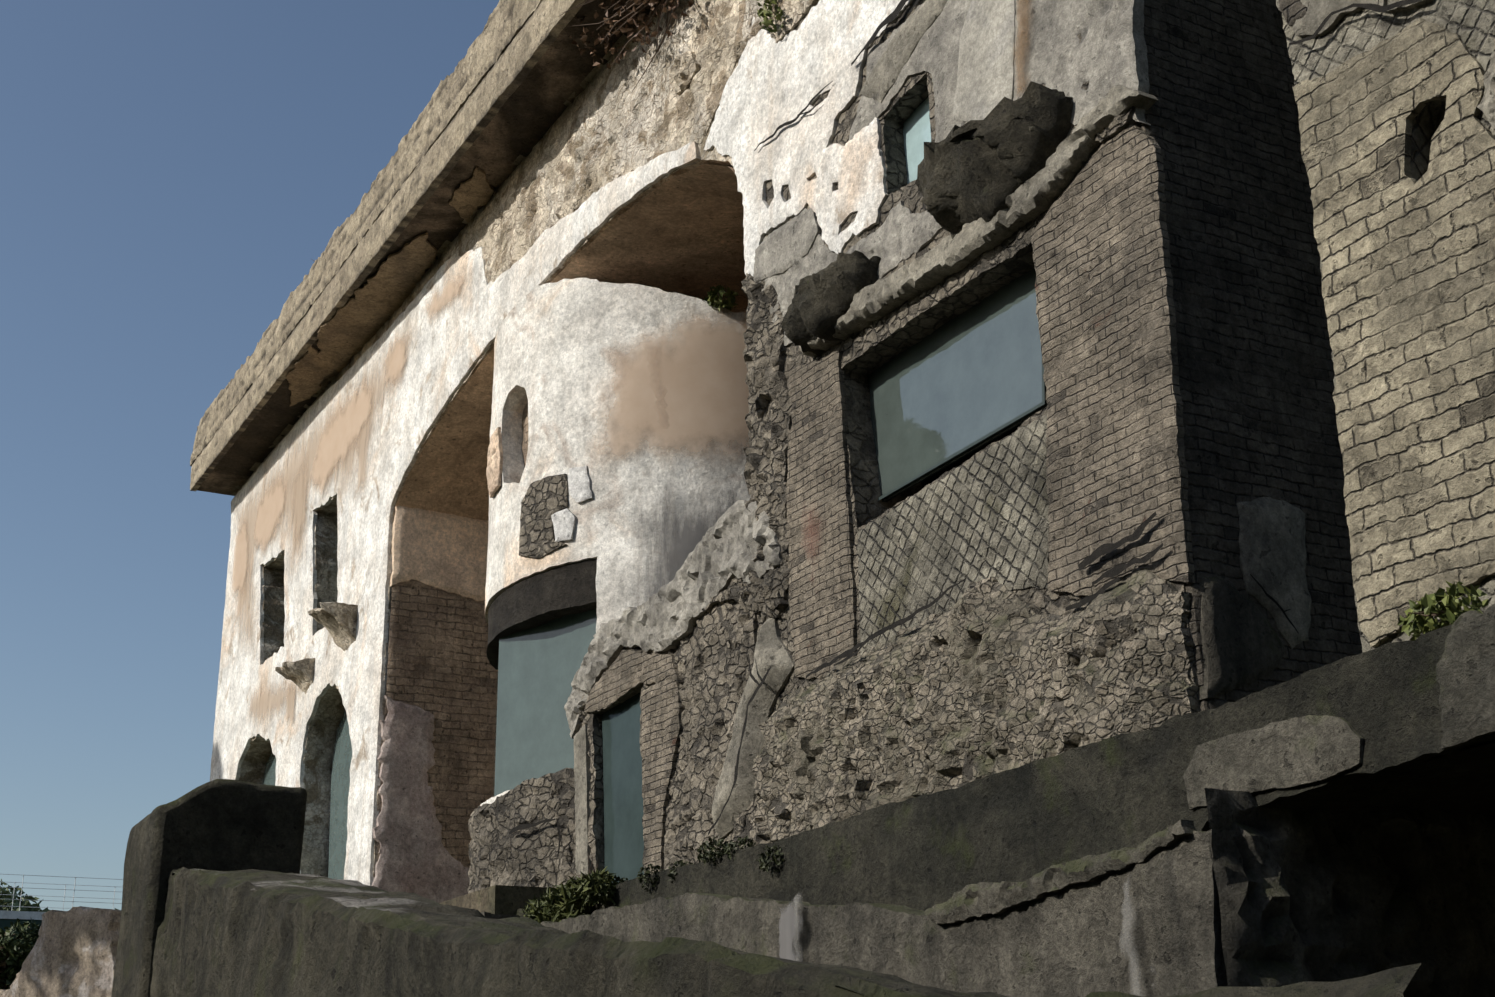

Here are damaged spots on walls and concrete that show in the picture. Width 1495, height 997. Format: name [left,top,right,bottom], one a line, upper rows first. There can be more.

spalling [859,0,948,103]
flaking render [953,0,1016,122]
spalling [1278,0,1309,27]
water stain [237,365,388,636]